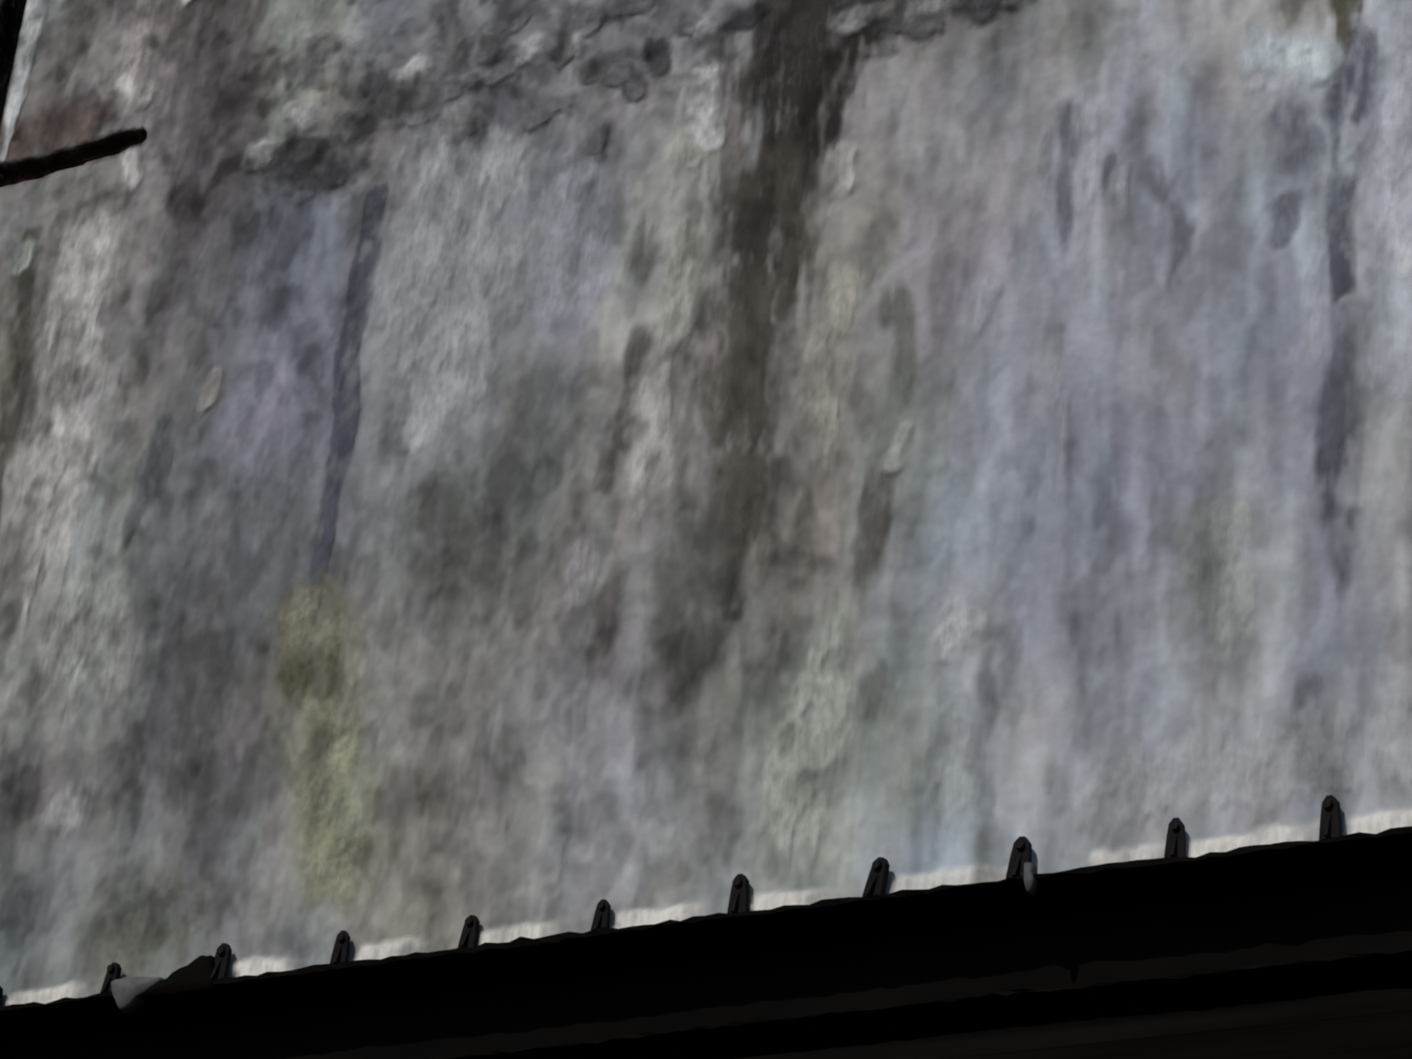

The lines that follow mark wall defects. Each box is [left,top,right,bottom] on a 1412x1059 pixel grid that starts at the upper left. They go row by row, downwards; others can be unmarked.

rust [1,101,114,160]
damp [1241,0,1412,322]
damp [601,0,920,617]
damp [1311,289,1412,511]
damp [563,542,620,662]
damp [758,615,883,858]
damp [901,698,974,814]
damp [937,606,987,659]